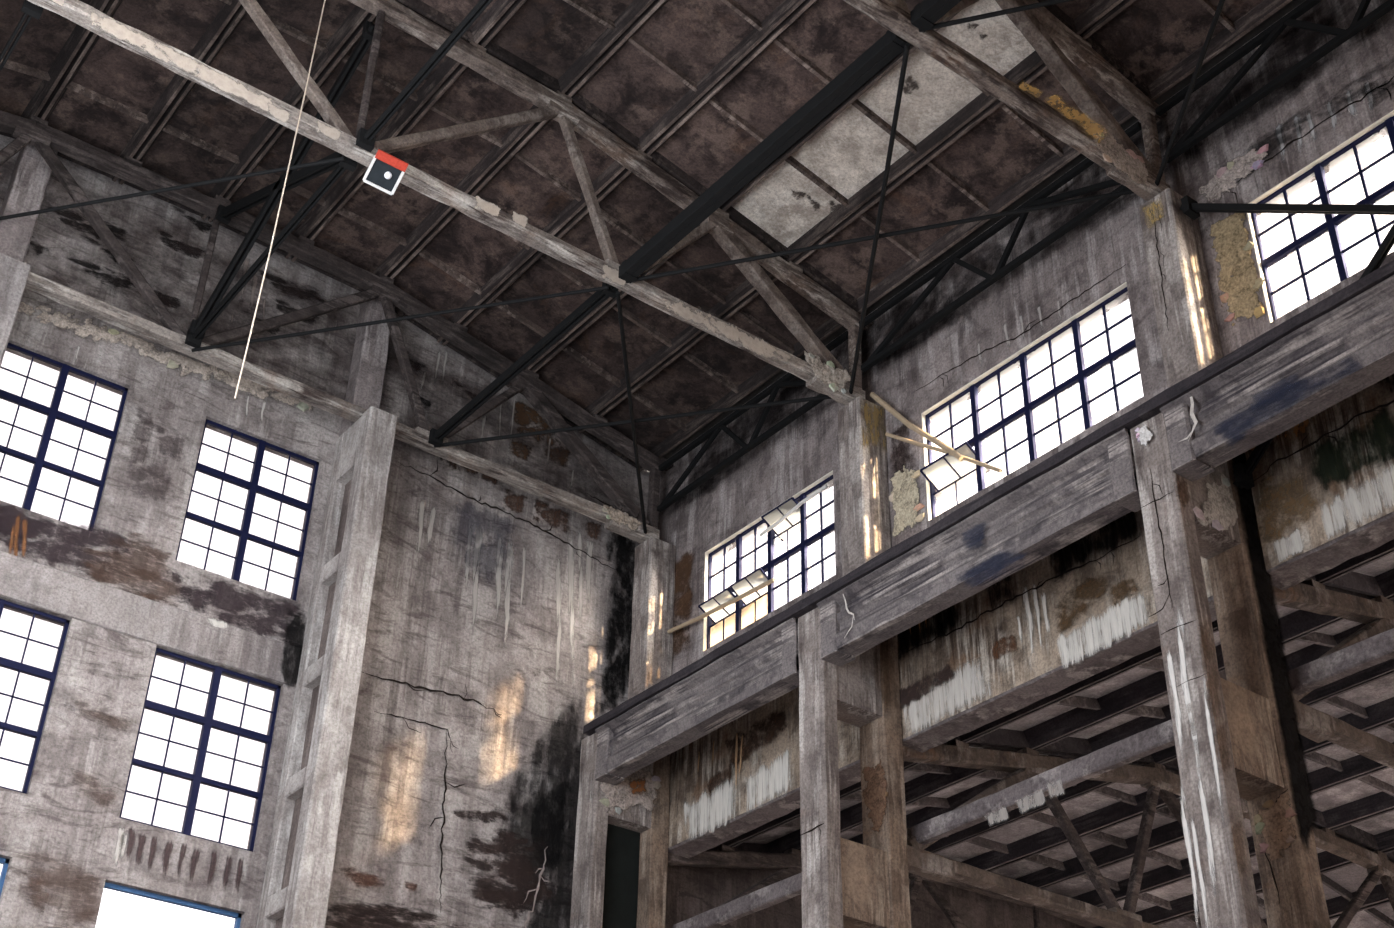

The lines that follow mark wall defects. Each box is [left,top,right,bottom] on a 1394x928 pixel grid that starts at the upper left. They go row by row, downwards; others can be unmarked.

peeling [90,12,290,123]
peeling [475,196,528,228]
peeling [1199,144,1269,203]
peeling [1206,213,1265,326]
peeling [666,301,851,394]
water stain [1257,466,1394,561]
water stain [0,505,299,642]
water stain [986,576,1147,667]
water stain [899,662,991,733]
crack [363,672,502,913]
water stain [454,811,554,919]
water stain [325,904,465,928]